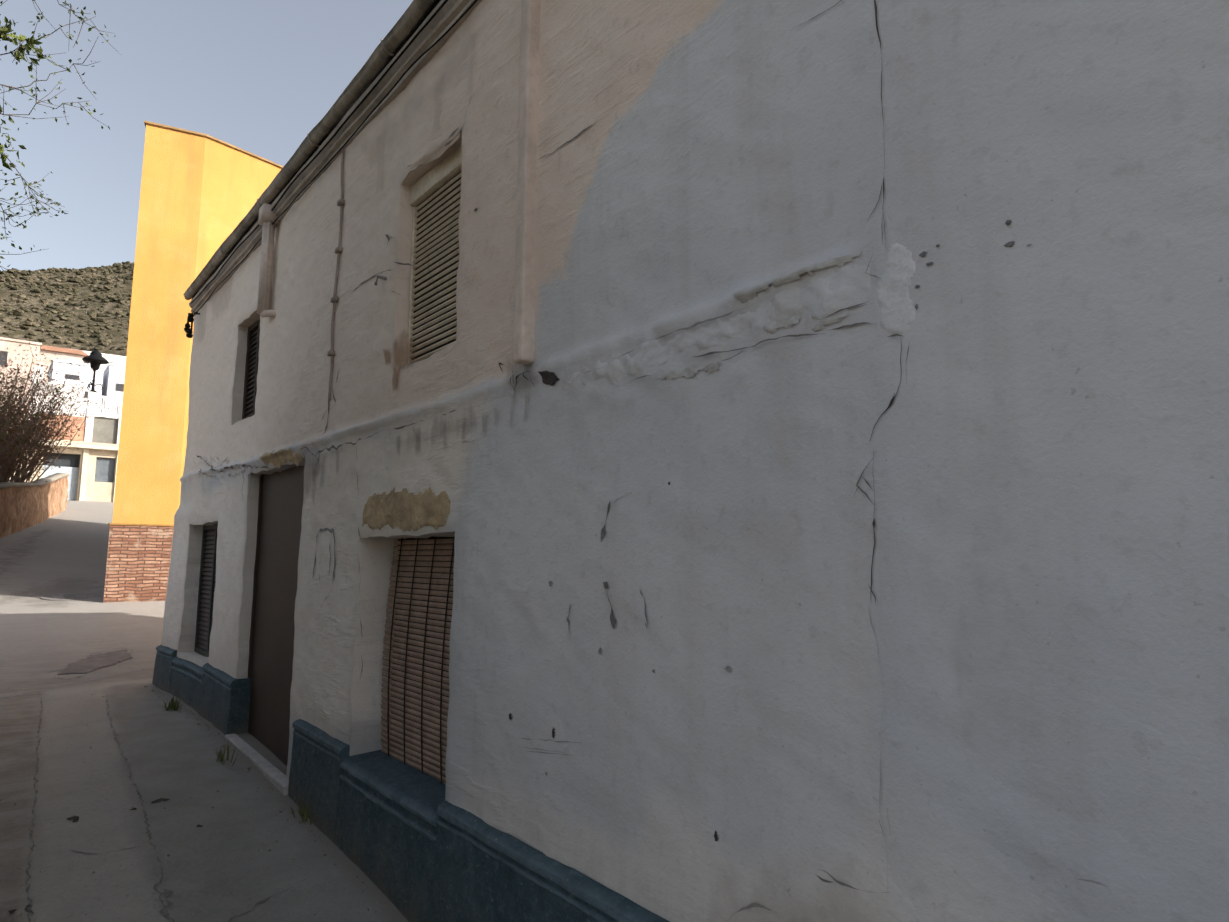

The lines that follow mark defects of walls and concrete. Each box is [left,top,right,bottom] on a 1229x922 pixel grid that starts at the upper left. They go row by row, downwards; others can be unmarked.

spalling [538,250,871,386]
crack [583,0,910,663]
spalling [362,487,450,532]